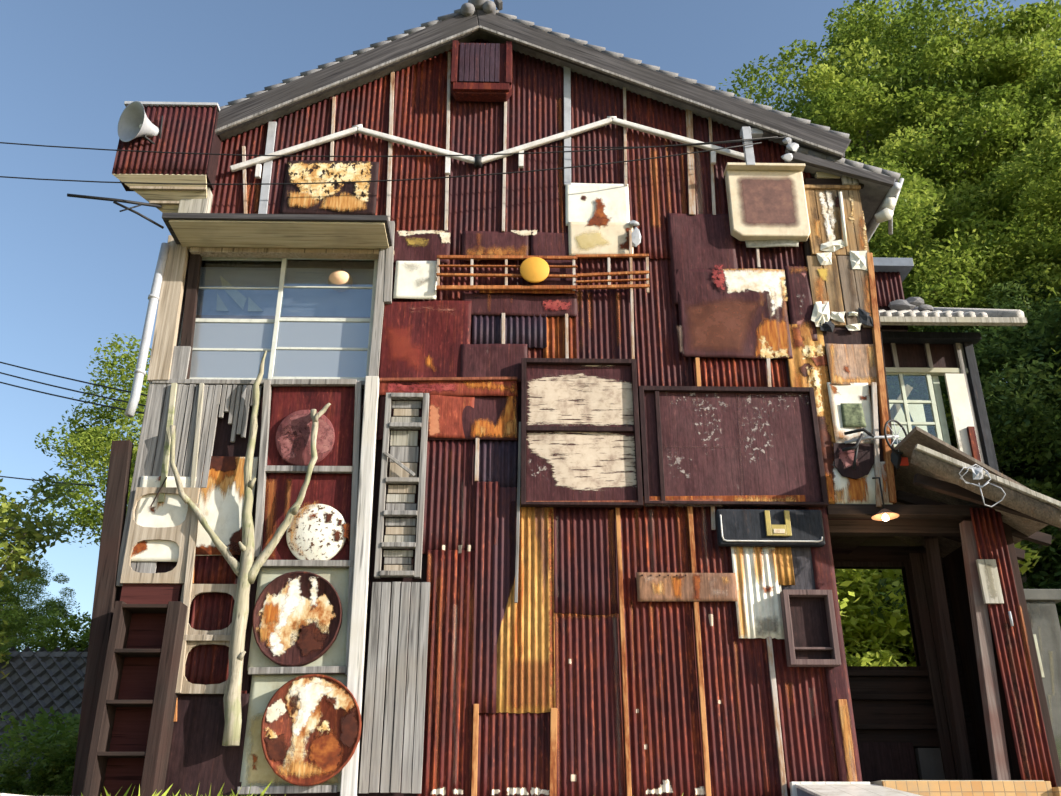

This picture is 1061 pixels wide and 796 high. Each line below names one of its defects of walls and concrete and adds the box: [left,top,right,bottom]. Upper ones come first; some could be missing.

peeling [289,161,371,210]
corrosion [576,198,610,249]
corrosion [387,381,517,438]
peeling [526,365,637,490]
peeling [677,393,726,445]
peeling [746,394,808,462]
corrosion [689,301,877,503]
corrosion [296,625,327,656]
corrosion [507,507,615,710]
corrosion [717,547,779,637]
corrosion [264,734,289,764]
corrosion [309,708,359,775]